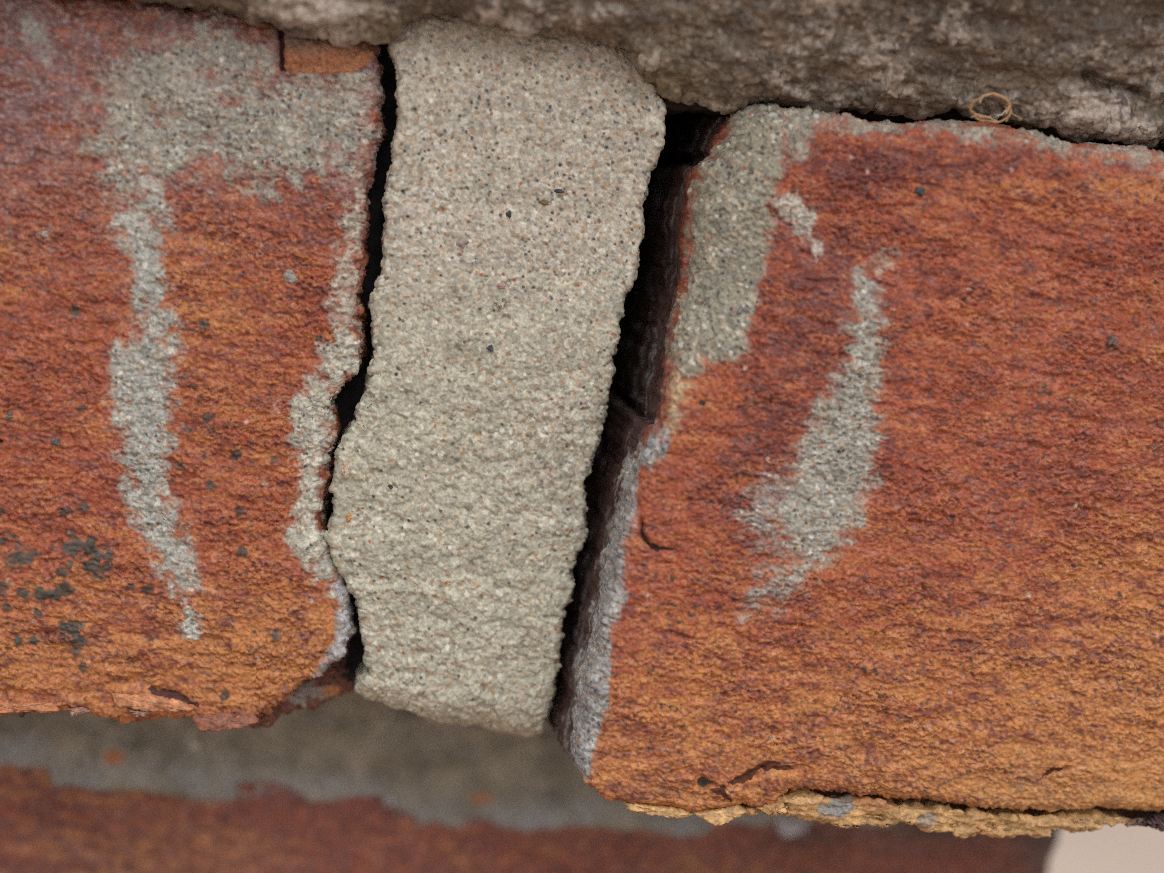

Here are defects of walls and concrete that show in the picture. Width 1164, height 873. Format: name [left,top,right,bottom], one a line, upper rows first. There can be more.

crack [656,97,730,168]
crack [839,108,1164,152]
crack [326,43,398,522]
crack [609,382,619,392]
crack [640,522,674,552]
crack [339,596,365,682]
spalling [623,787,1164,839]